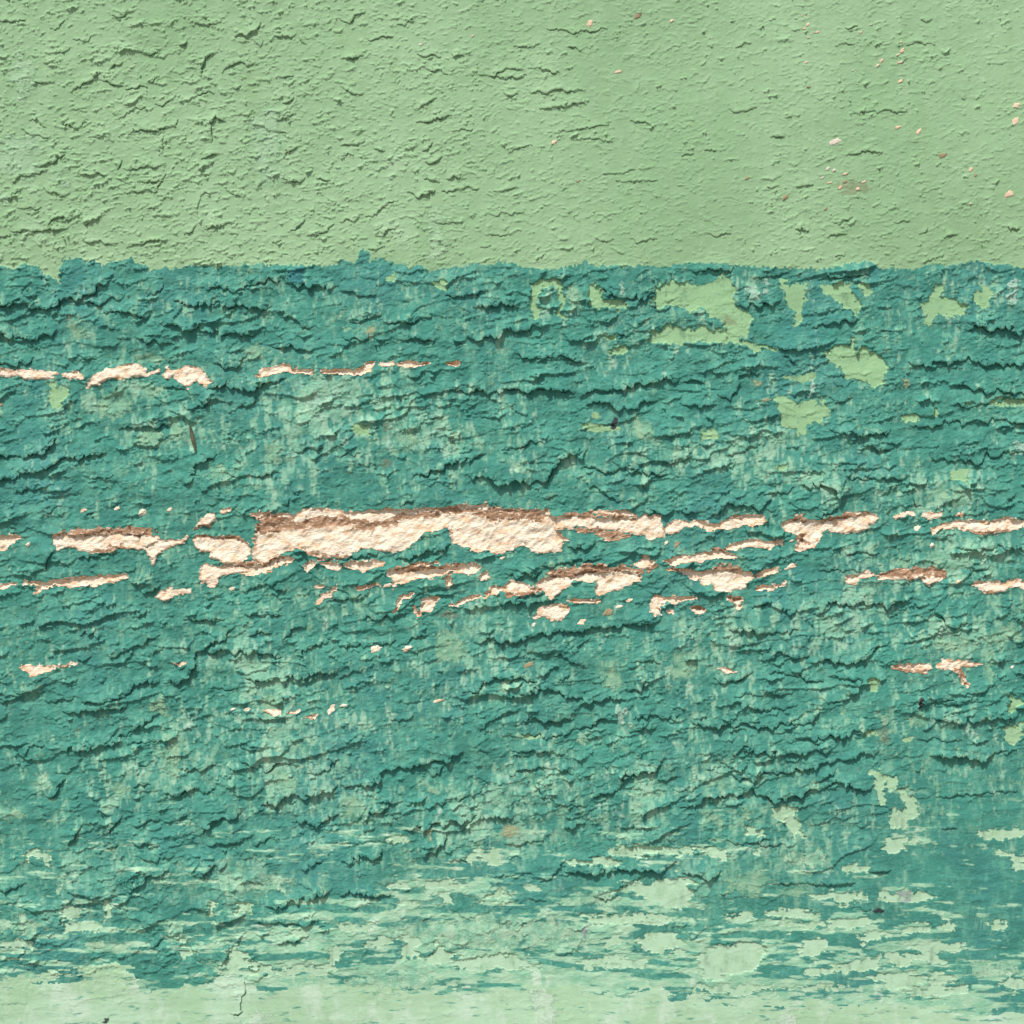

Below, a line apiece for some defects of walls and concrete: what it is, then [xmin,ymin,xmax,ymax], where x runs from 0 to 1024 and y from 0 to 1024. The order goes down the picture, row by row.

spalling [0,274,432,448]
peeling [433,264,889,389]
spalling [0,524,30,551]
spalling [19,655,92,677]
spalling [0,573,129,595]
spalling [44,429,908,865]
spalling [812,447,1024,763]
peeling [0,848,113,951]
peeling [131,840,174,889]
peeling [151,921,200,963]
peeling [198,640,1024,1001]